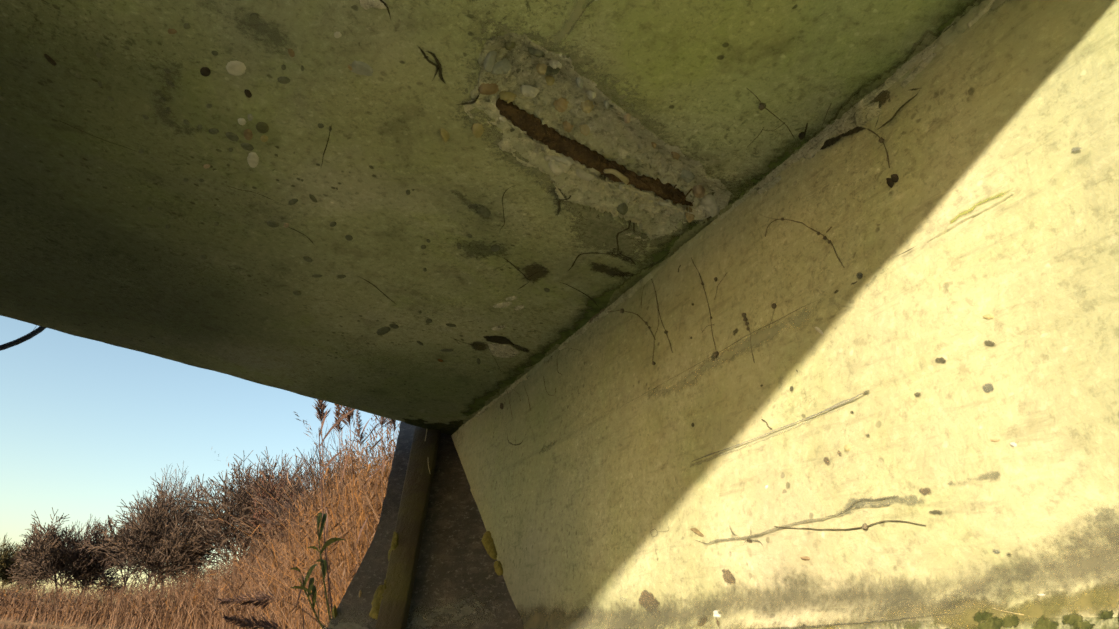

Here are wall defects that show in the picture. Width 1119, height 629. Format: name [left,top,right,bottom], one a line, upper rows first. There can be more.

spalling [455,17,741,252]
water stain [517,530,1119,629]